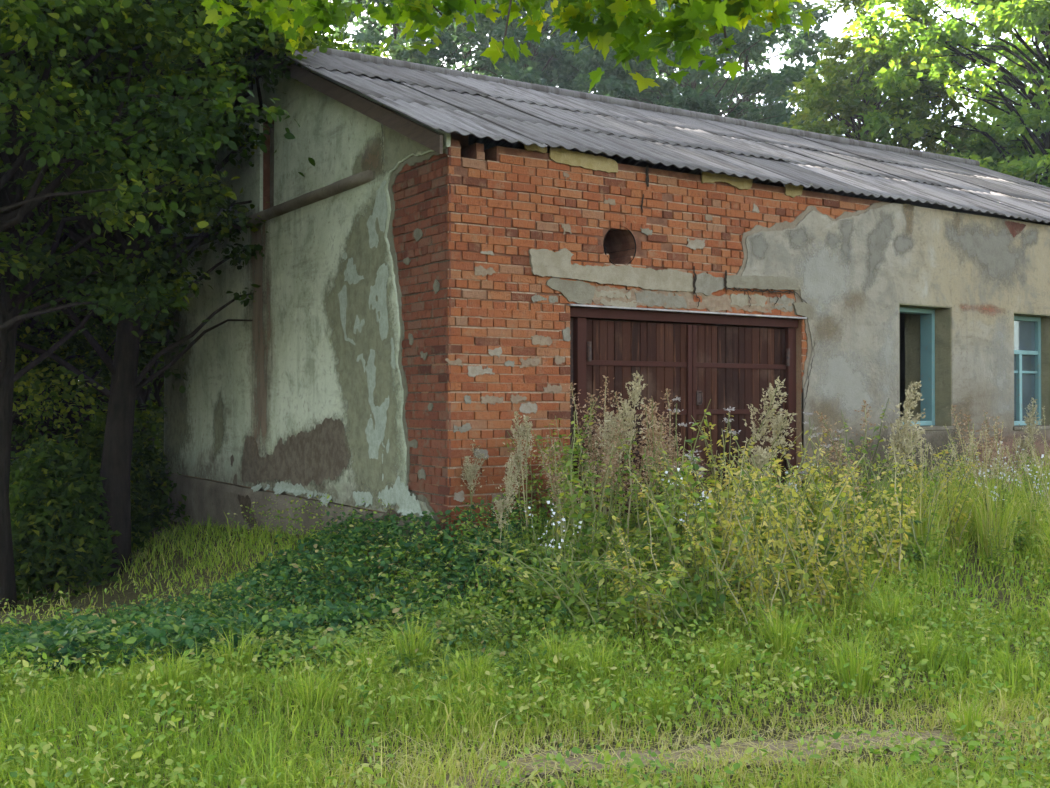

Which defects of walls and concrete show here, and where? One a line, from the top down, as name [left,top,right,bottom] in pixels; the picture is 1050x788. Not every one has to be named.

leakage [161,311,191,466]
leakage [213,392,225,455]
spalling [230,144,870,543]